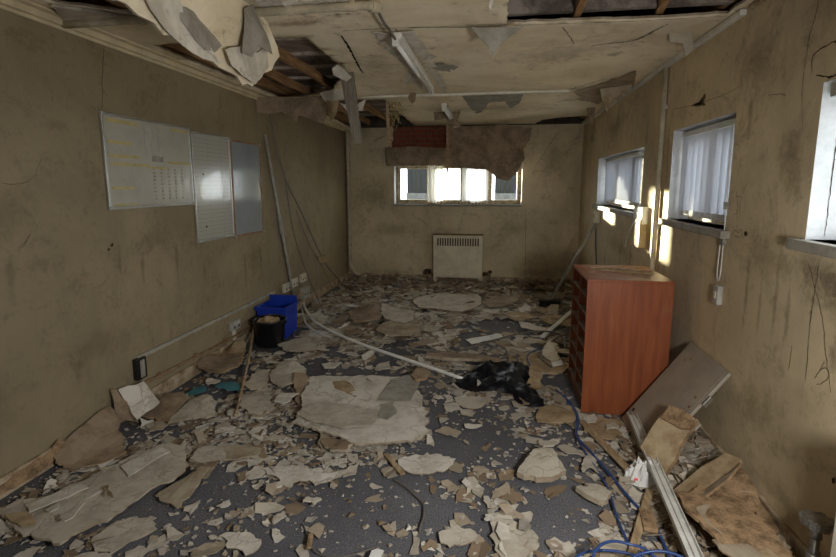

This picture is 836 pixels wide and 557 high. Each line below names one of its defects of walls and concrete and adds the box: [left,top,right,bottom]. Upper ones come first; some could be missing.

crack [341,11,442,73]
crack [769,0,836,96]
flaking render [392,126,446,148]
crack [824,148,836,236]
crack [788,262,831,393]